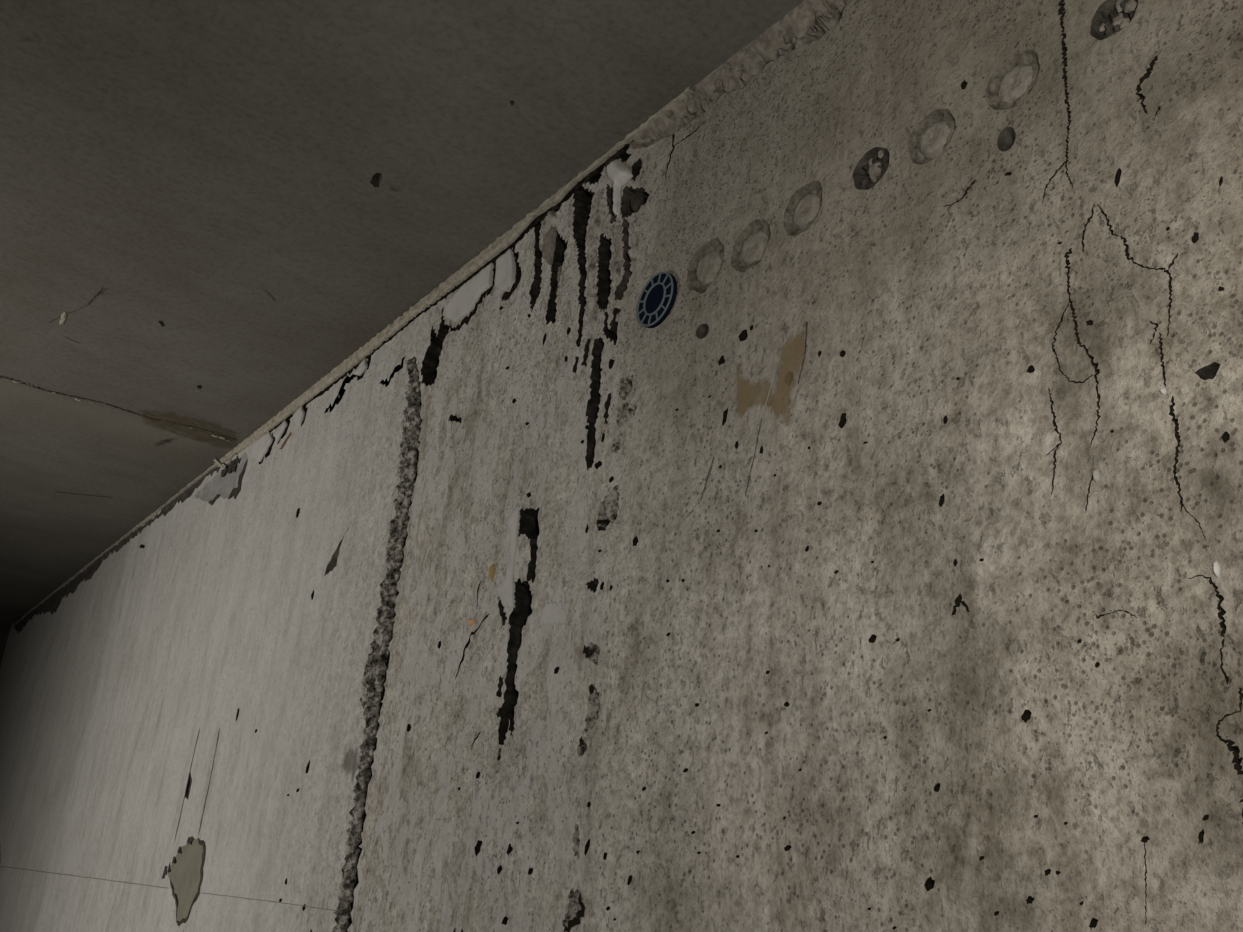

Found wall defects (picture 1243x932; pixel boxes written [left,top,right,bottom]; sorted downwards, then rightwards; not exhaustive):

spalling [627,0,852,150]
spalling [997,126,1016,152]
water stain [607,159,633,215]
peeling [421,247,522,386]
spalling [611,375,637,453]
crack [1042,0,1243,824]
peeling [13,403,308,633]
spalling [324,524,351,576]
spalling [596,485,620,531]
peeling [489,505,540,760]
peeling [162,836,206,926]
crack [1141,843,1149,925]